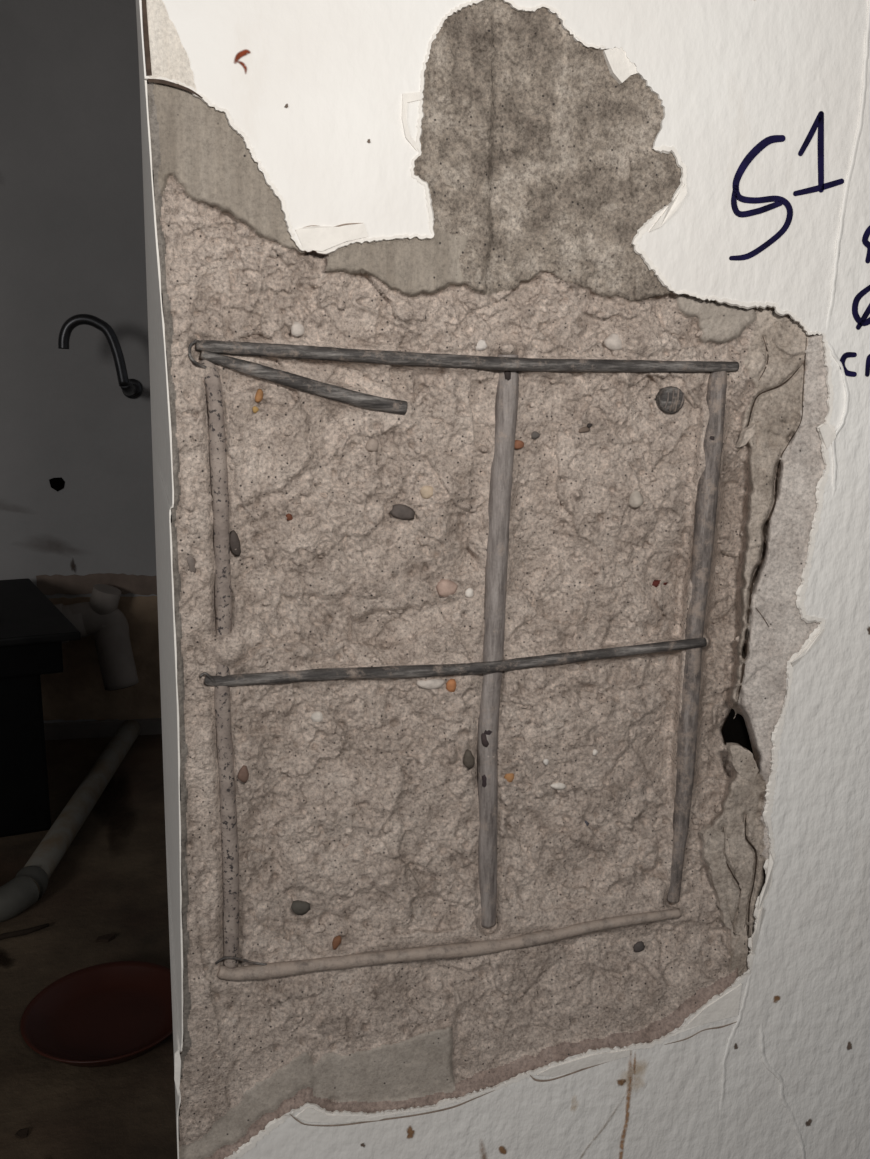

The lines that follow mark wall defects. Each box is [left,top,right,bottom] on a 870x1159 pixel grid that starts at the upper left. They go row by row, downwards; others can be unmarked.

crack [738,0,870,700]
flaking render [36,573,161,721]
spalling [144,0,836,1159]
crack [530,1054,636,1159]
crack [664,976,806,1159]